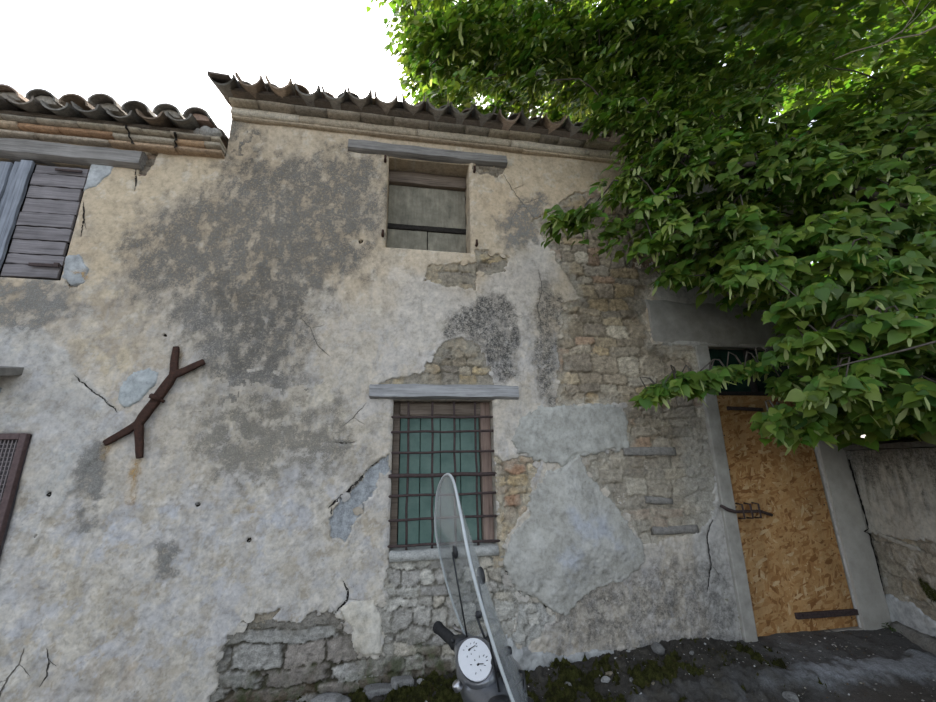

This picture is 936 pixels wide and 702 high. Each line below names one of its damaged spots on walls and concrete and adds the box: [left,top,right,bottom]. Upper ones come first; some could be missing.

leakage [120,120,388,485]
spalling [424,250,509,290]
crack [78,378,117,412]
spalling [372,338,497,385]
leakage [444,295,519,381]
spalling [532,192,716,545]
spalling [209,455,556,702]
crack [707,521,717,590]
crack [0,648,56,694]